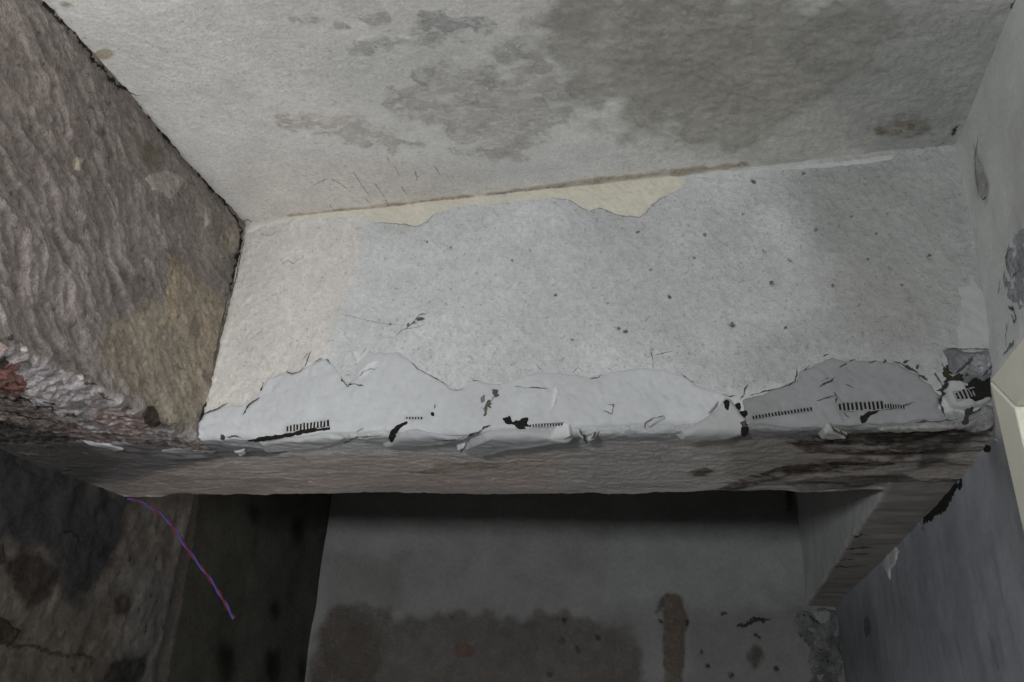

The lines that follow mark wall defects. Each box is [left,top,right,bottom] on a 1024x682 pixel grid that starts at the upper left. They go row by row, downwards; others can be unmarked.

peeling [245,176,686,234]
spalling [0,334,114,411]
spalling [878,348,995,433]
peeling [259,434,344,452]
peeling [550,423,573,440]
damp [719,428,972,510]
damp [301,606,641,682]
damp [656,594,686,682]
spalling [792,607,843,682]